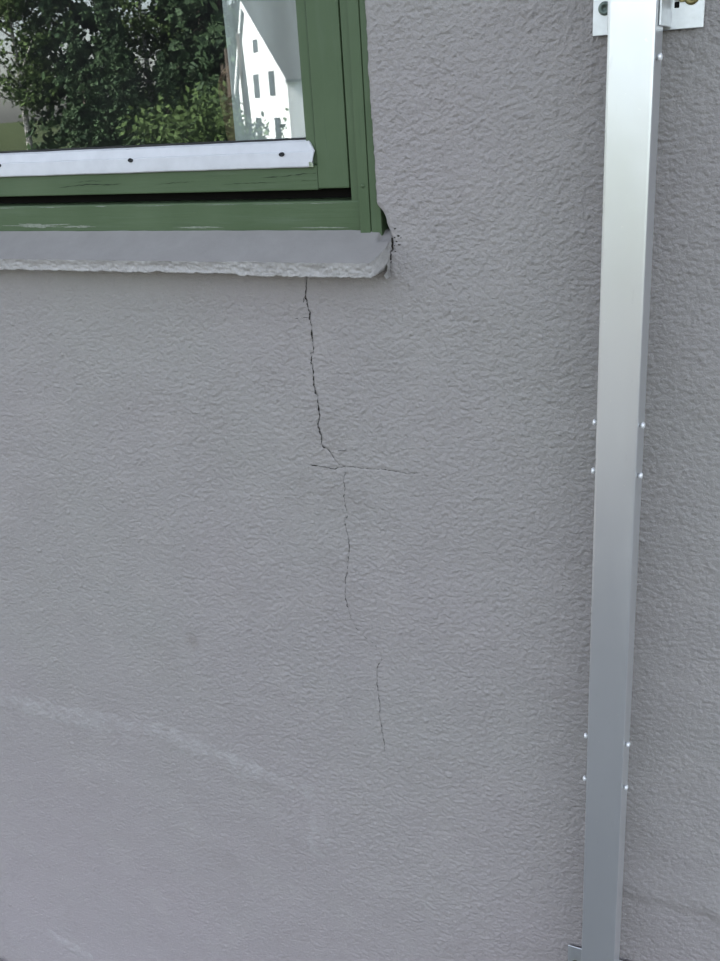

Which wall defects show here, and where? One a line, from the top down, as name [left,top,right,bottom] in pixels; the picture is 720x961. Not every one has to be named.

crack [295,280,415,639]